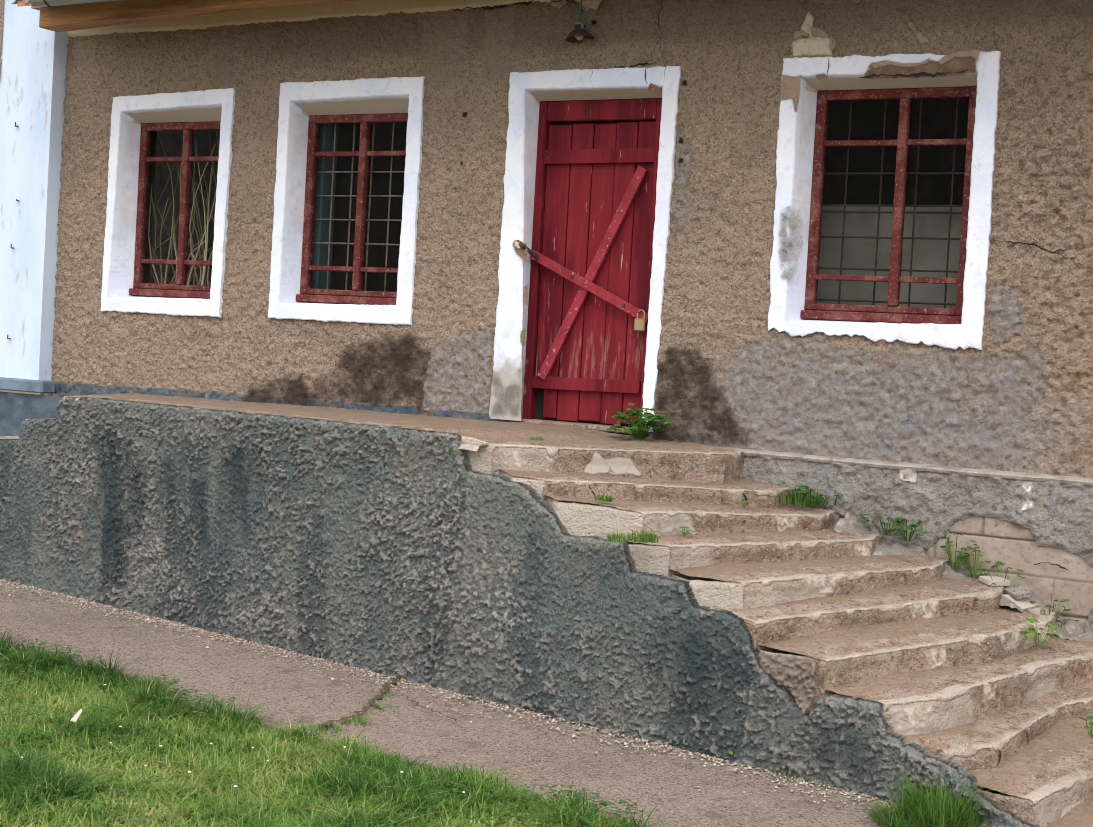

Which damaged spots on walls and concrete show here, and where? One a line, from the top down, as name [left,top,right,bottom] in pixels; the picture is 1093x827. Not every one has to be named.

flaking render [792,12,836,56]
peeling [780,75,801,112]
flaking render [860,50,979,79]
peeling [779,207,802,279]
crack [995,239,1074,259]
damp [991,286,1023,344]
damp [245,330,520,415]
damp [654,338,1041,466]
flaking render [925,515,1093,630]
peeling [1000,625,1049,648]